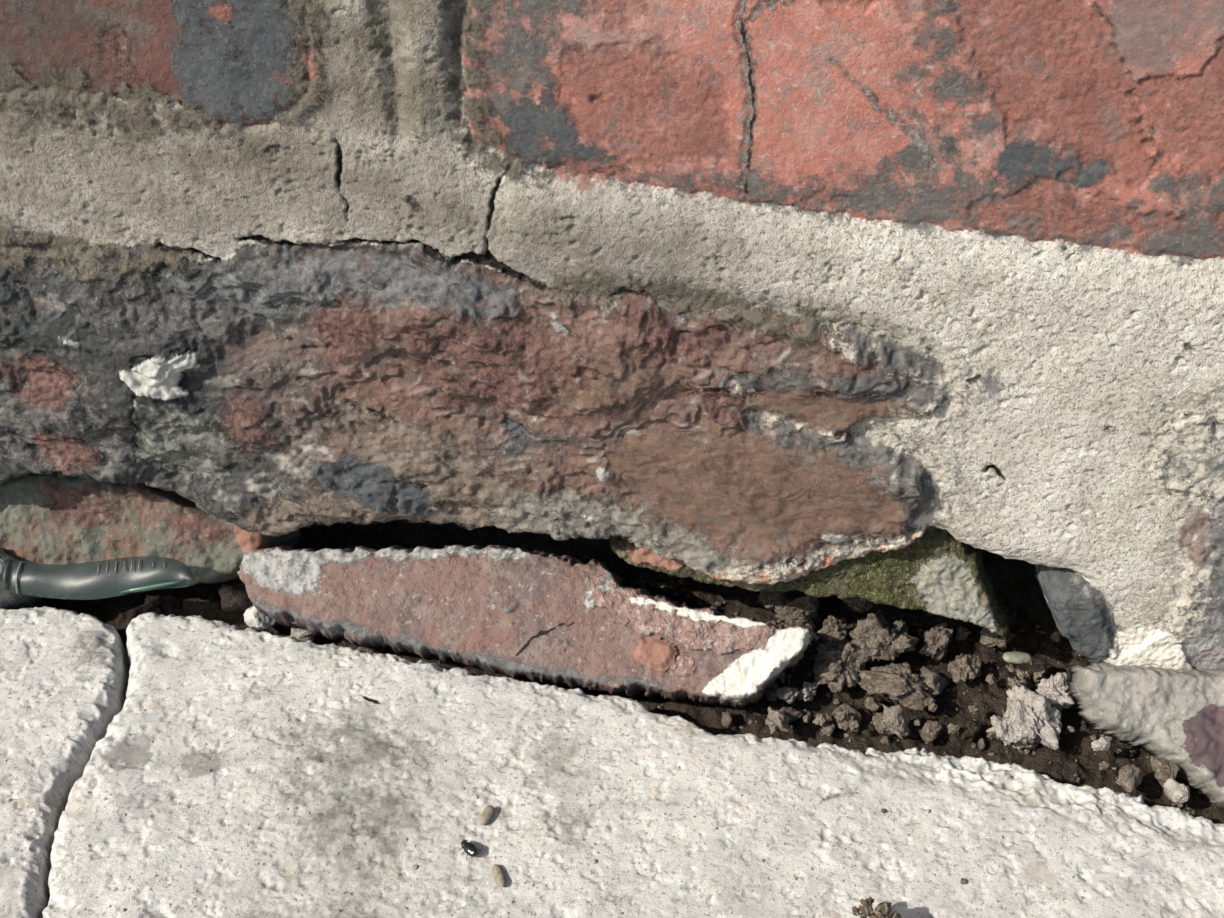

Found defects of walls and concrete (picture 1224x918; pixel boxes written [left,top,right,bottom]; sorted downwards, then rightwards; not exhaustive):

crack [730,0,793,201]
crack [1151,127,1161,166]
crack [336,143,546,289]
crack [158,235,295,266]
spalling [617,292,726,366]
spalling [0,349,79,412]
peeling [119,352,198,401]
spalling [399,300,600,444]
spalling [698,390,750,427]
spalling [626,525,936,585]